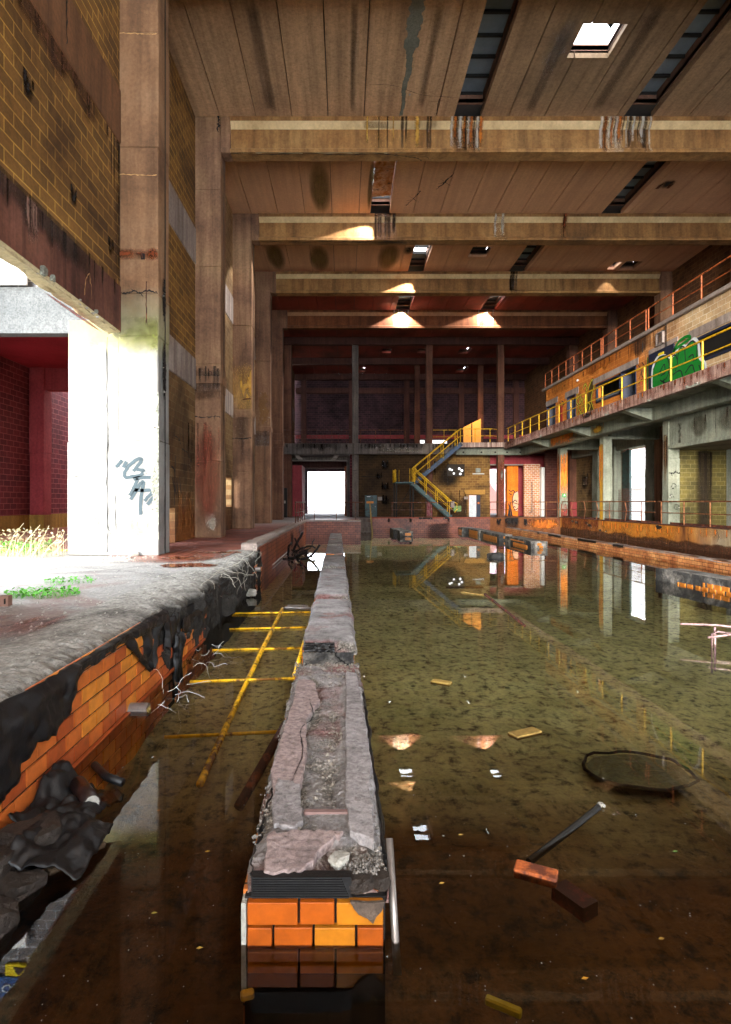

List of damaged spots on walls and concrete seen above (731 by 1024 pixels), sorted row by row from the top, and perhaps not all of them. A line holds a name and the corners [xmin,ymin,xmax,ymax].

leakage [311,167,329,209]
leakage [0,165,115,291]
leakage [368,165,398,268]
corrosion [120,249,158,259]
leakage [267,246,284,268]
leakage [311,248,328,269]
crack [121,289,158,301]
corrosion [508,400,727,541]
spalling [0,550,262,702]
spalling [349,867,391,895]